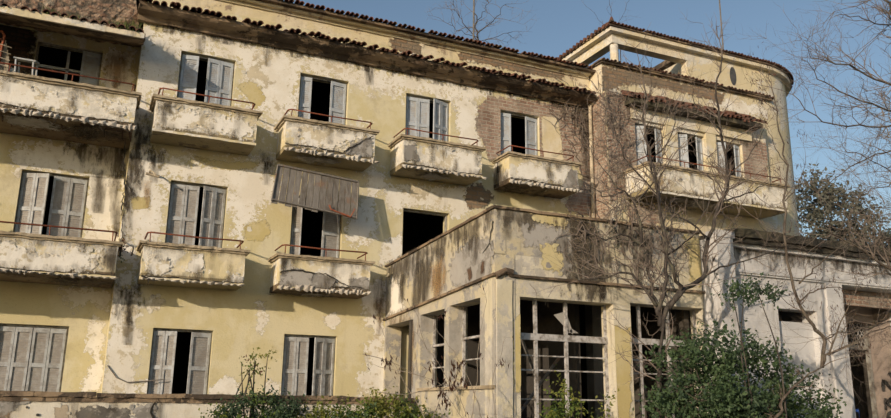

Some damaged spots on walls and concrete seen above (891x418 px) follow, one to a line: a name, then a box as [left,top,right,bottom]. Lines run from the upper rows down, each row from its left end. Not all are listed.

leakage [155,25,253,46]
leakage [49,114,166,235]
flaking render [0,24,768,398]
flaking render [662,139,787,209]
leakage [39,246,140,341]
leakage [375,209,658,383]
flaking render [0,398,40,418]
flaking render [53,402,157,418]